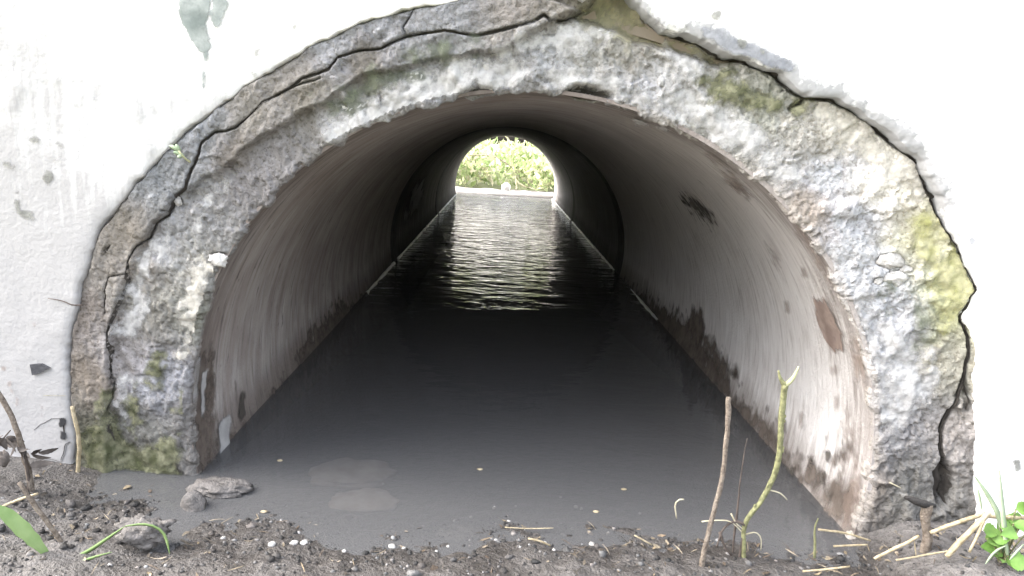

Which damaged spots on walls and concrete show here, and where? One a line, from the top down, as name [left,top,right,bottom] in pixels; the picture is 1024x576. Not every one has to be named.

water stain [111,235,170,336]
crack [103,2,594,460]
crack [647,24,977,503]
corrosion [813,296,843,352]
water stain [113,375,141,419]